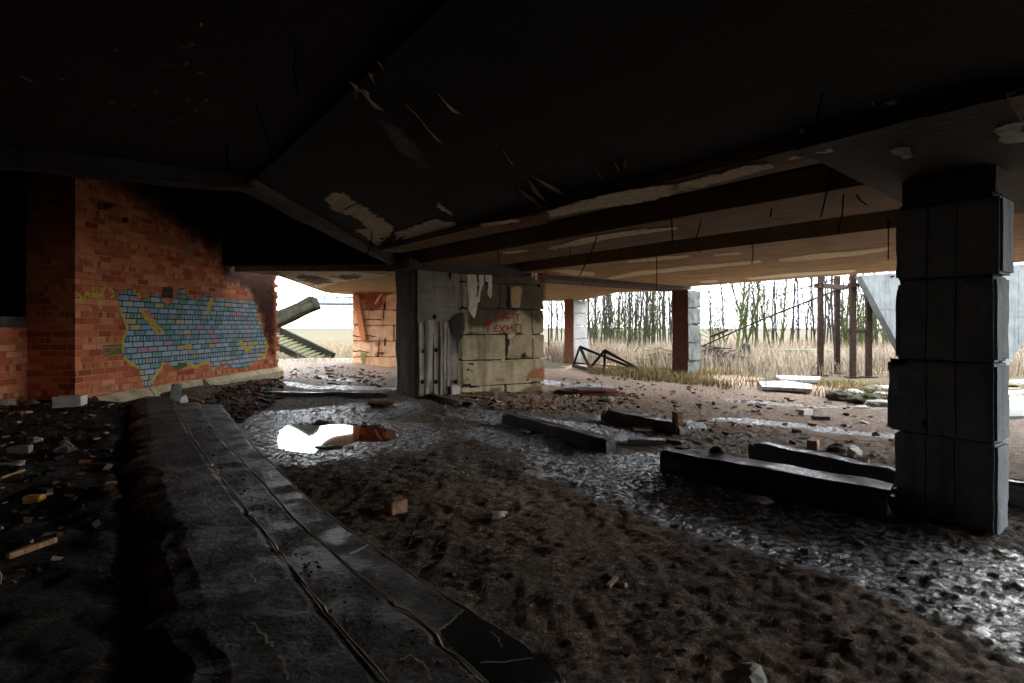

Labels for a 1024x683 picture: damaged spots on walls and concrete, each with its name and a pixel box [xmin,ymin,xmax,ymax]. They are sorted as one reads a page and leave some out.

peeling [992,122,1024,144]
peeling [324,192,456,246]
peeling [479,219,520,227]
peeling [518,164,773,243]